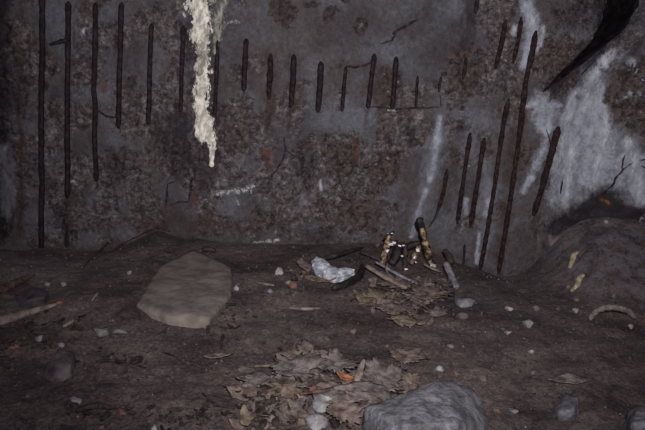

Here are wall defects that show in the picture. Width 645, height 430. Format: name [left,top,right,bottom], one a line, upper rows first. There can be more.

damp [166,0,239,190]
crack [380,19,418,44]
damp [520,45,645,236]